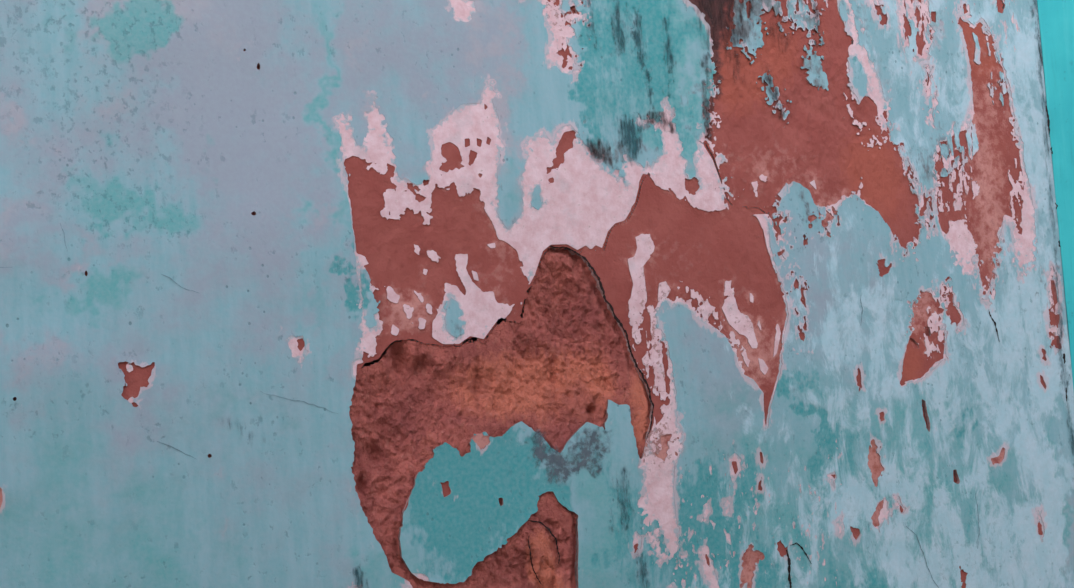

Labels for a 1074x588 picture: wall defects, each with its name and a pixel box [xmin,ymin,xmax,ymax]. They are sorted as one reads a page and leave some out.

peeling [118,361,155,407]
peeling [334,0,1038,588]